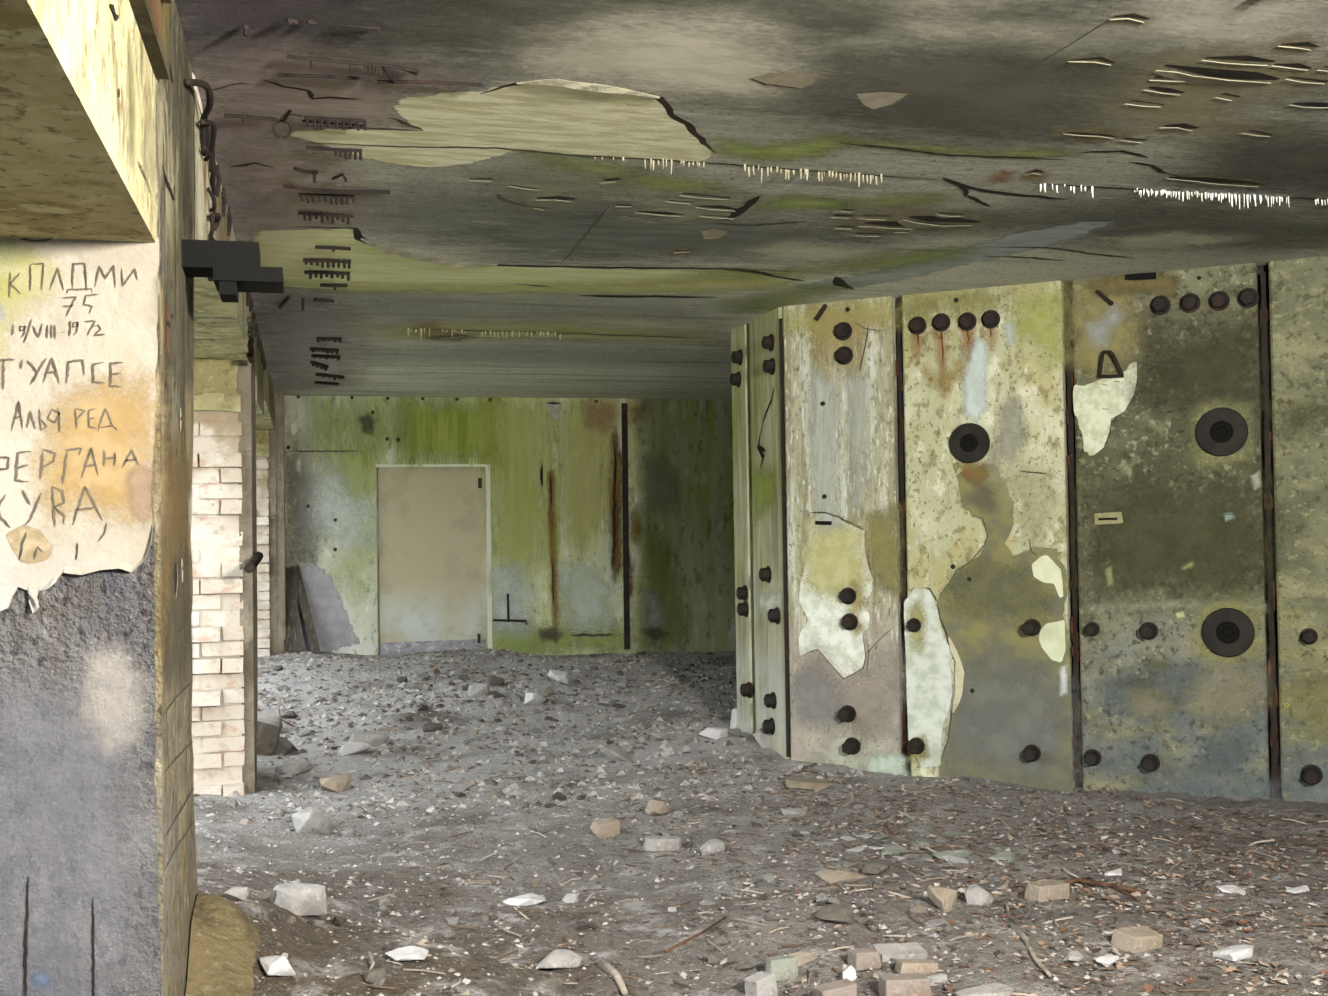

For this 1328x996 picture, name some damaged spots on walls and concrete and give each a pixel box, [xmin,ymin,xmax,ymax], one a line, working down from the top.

spalling [183,73,277,240]
flaking render [251,55,802,311]
damp [175,0,1328,290]
peeling [856,91,910,109]
corrosion [926,328,995,389]
flaking render [1070,275,1180,456]
damp [287,468,374,563]
damp [492,565,528,632]
damp [557,565,612,632]
peeling [799,514,953,767]
peeling [1032,555,1063,598]
peeling [1039,620,1066,662]